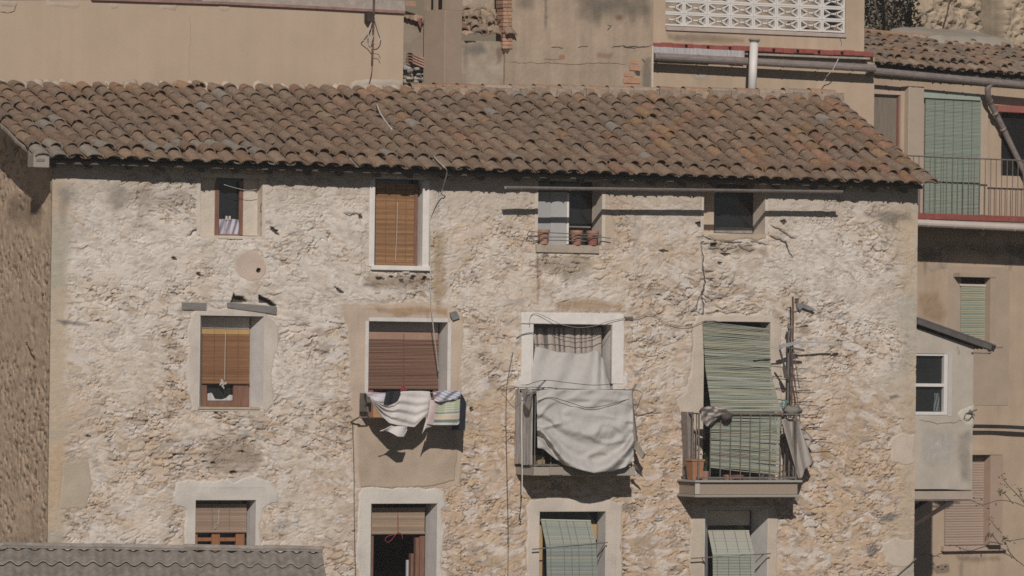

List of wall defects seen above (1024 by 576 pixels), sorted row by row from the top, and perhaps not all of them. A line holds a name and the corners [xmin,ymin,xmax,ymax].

crack [692,226,796,315]